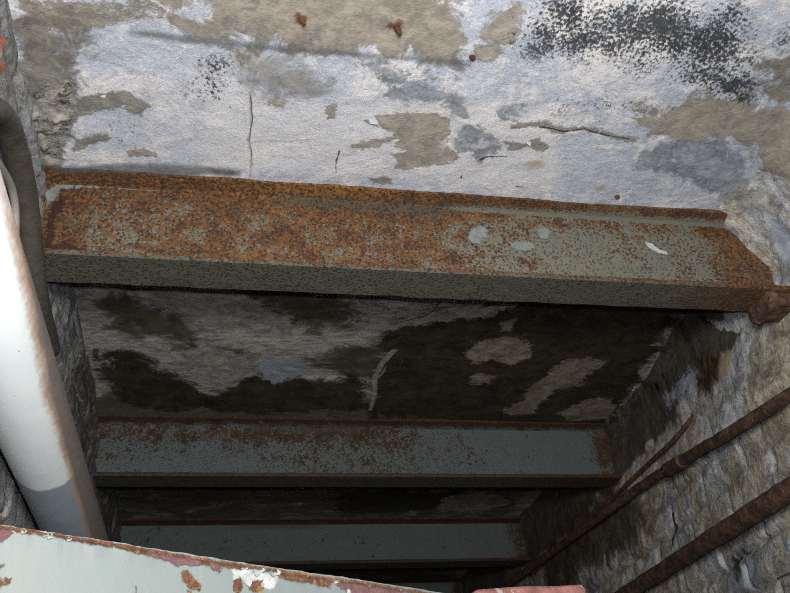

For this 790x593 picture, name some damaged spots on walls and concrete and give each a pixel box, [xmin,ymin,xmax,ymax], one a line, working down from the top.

mould [510,0,761,105]
crack [248,93,260,165]
crack [510,120,636,142]
rust [43,196,87,250]
leakage [93,287,197,350]
leakage [234,289,365,335]
leakage [92,302,708,429]
rust [697,353,722,397]
peeling [0,526,13,542]
rust [0,525,431,593]